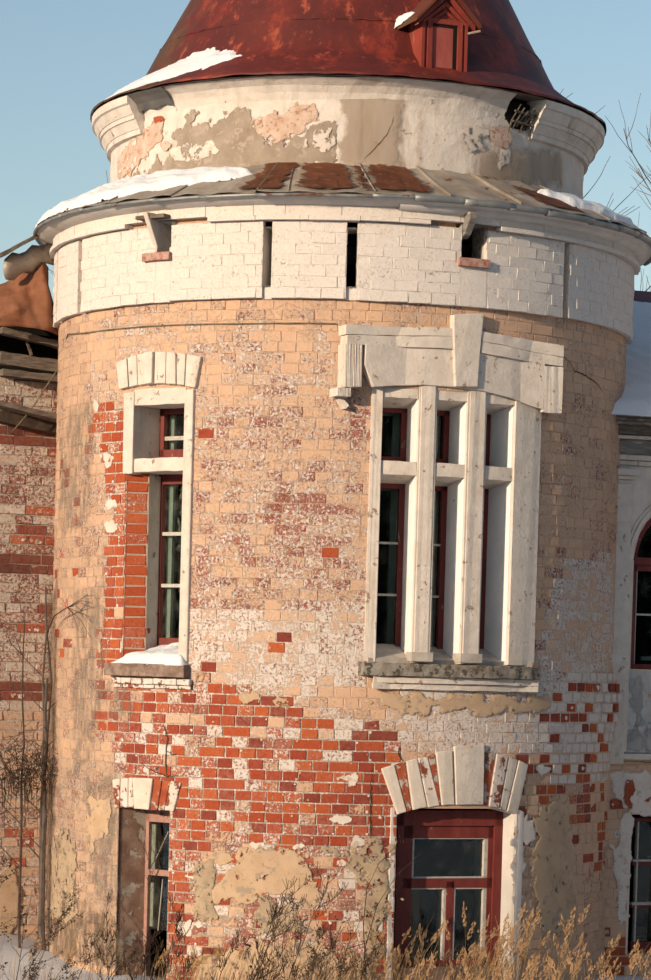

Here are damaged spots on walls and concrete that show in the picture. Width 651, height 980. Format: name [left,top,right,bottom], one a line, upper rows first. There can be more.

flaking render [116,102,337,179]
spalling [460,101,539,171]
corrosion [239,162,431,196]
spalling [198,427,214,438]
peeling [79,398,151,668]
spalling [322,548,344,558]
spalling [268,632,291,656]
flaking render [368,691,551,718]
flaking render [86,792,114,854]
peeling [92,661,404,980]
flaking render [510,754,651,976]